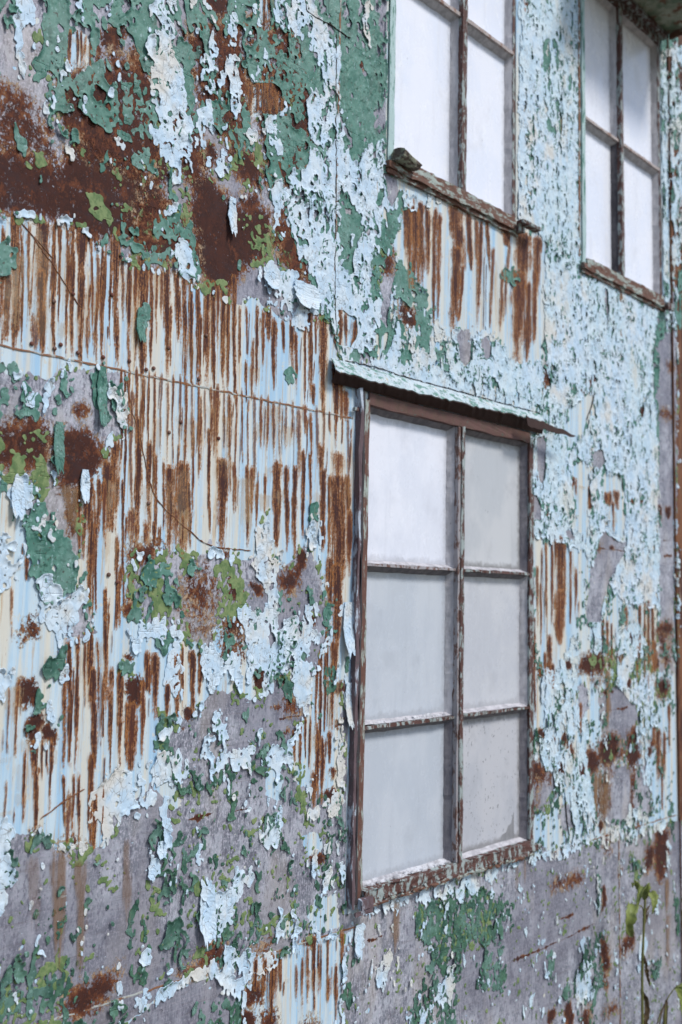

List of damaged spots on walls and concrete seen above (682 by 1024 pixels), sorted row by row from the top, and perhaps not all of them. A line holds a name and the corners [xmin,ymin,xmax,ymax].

peeling [0,117,28,170]
peeling [0,188,92,238]
peeling [85,192,113,227]
peeling [99,150,123,196]
peeling [131,141,159,190]
corrosion [380,199,543,365]
peeling [284,366,298,385]
corrosion [0,0,357,860]
peeling [0,358,135,754]
corrosion [533,534,674,884]
corrosion [241,930,344,1024]
corrosion [547,933,637,1024]